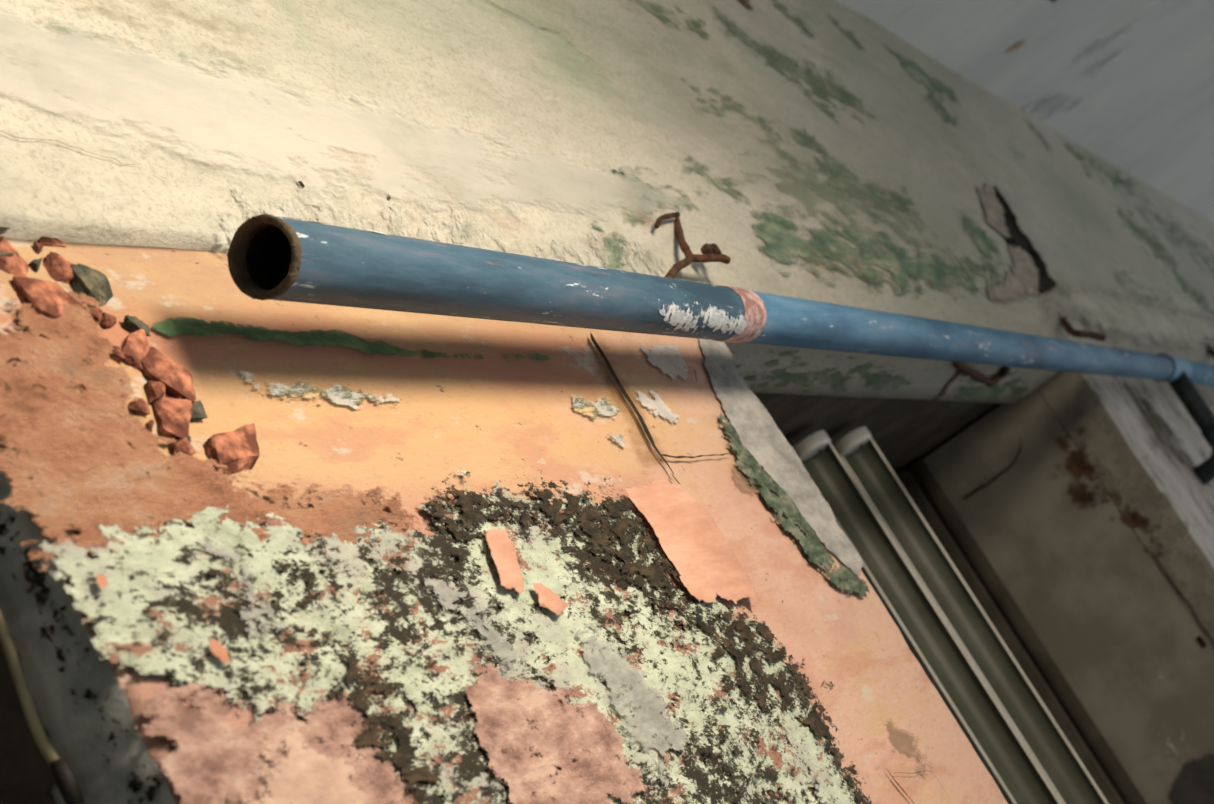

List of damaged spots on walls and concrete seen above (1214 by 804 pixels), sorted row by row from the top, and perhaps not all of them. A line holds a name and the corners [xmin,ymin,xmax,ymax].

spalling [977,183,1039,304]
peeling [0,236,869,804]
crack [590,333,732,485]
corrosion [1057,428,1169,556]
mould [1123,381,1214,509]